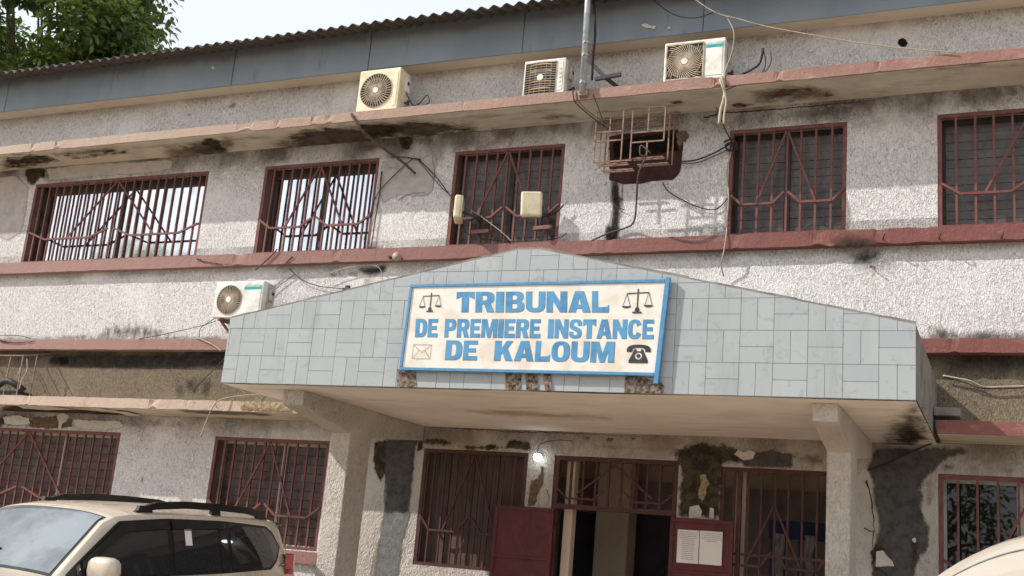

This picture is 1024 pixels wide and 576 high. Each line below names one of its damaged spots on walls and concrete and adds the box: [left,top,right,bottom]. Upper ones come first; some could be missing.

damp [171,139,234,157]
damp [2,154,54,169]
damp [605,181,623,240]
peeling [397,369,417,388]
peeling [505,373,552,391]
peeling [625,376,664,394]
peeling [0,413,123,430]
damp [885,408,927,445]
peeling [876,550,894,567]